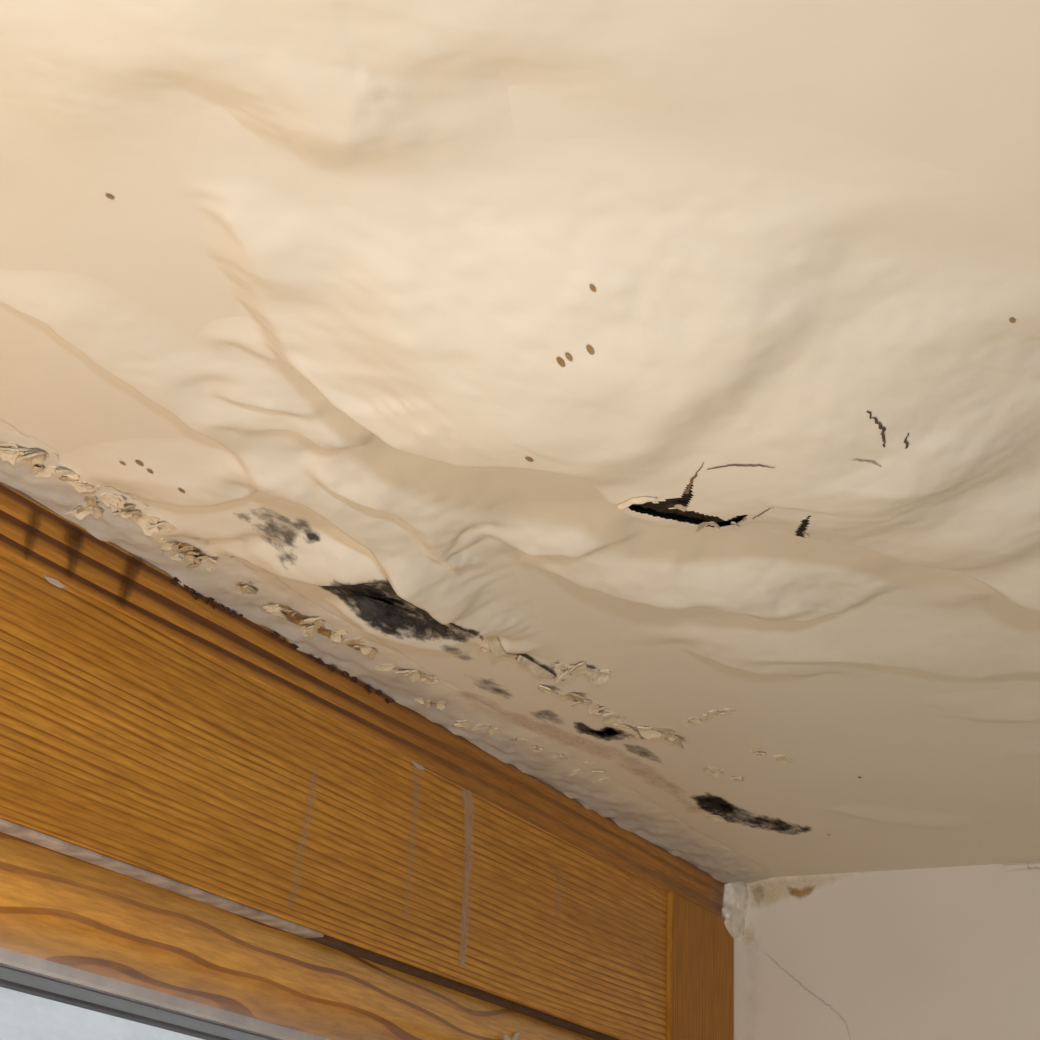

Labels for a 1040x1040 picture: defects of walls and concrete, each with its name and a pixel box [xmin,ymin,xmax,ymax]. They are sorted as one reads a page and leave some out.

crack [856,411,909,467]
leakage [264,515,319,560]
peeling [263,603,440,685]
peeling [705,814,729,825]